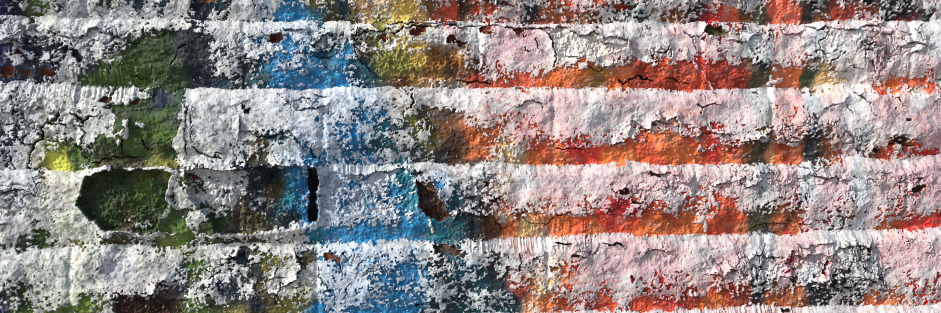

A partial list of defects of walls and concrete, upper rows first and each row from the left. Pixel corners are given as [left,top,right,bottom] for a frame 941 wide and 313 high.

peeling [0,32,58,79]
peeling [41,20,232,238]
peeling [233,0,342,111]
crack [352,0,559,67]
peeling [355,0,850,188]
crack [617,31,723,116]
crack [781,0,928,143]
peeling [4,226,57,255]
spalling [180,103,879,313]
crack [723,218,814,279]
crack [822,250,893,292]
crack [849,170,941,195]